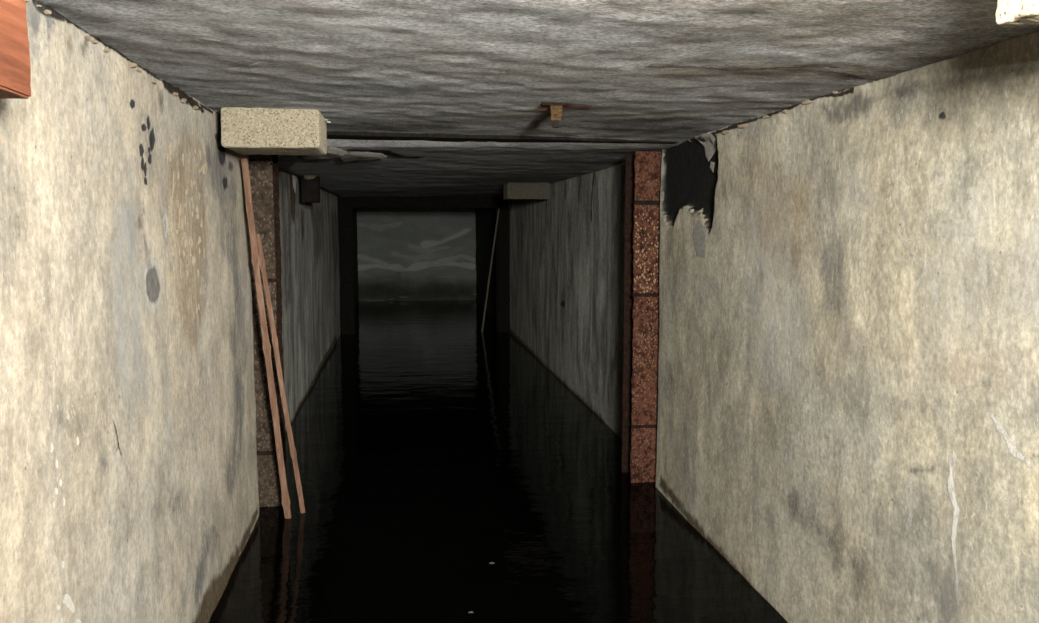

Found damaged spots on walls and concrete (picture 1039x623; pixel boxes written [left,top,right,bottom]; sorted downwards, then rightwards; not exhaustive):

water stain [139,117,155,185]
rust [530,103,592,129]
spalling [663,134,719,259]
water stain [117,211,161,376]